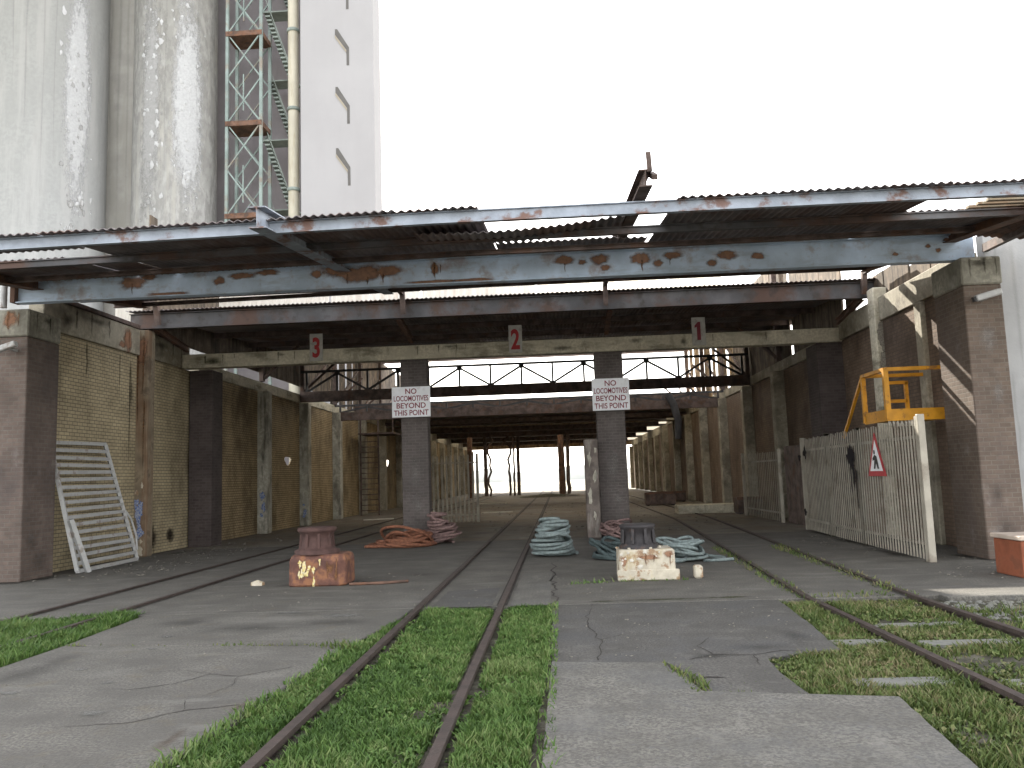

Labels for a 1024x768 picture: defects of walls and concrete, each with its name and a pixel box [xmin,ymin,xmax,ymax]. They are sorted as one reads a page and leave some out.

peeling [59,0,92,230]
peeling [140,0,205,222]
corrosion [554,254,610,271]
corrosion [630,252,681,271]
corrosion [707,250,737,266]
corrosion [121,275,187,296]
corrosion [214,269,279,285]
corrosion [311,265,402,284]
corrosion [408,263,492,284]